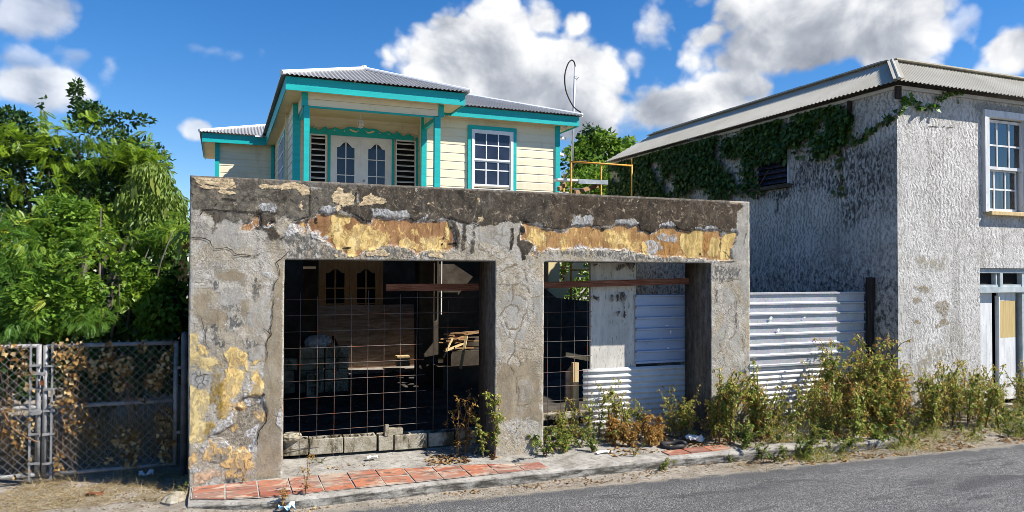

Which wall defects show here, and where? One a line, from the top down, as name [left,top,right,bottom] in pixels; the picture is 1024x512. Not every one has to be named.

peeling [194,177,236,195]
crack [191,184,311,357]
flaking render [241,182,457,258]
flaking render [520,215,738,270]
flaking render [188,271,434,485]